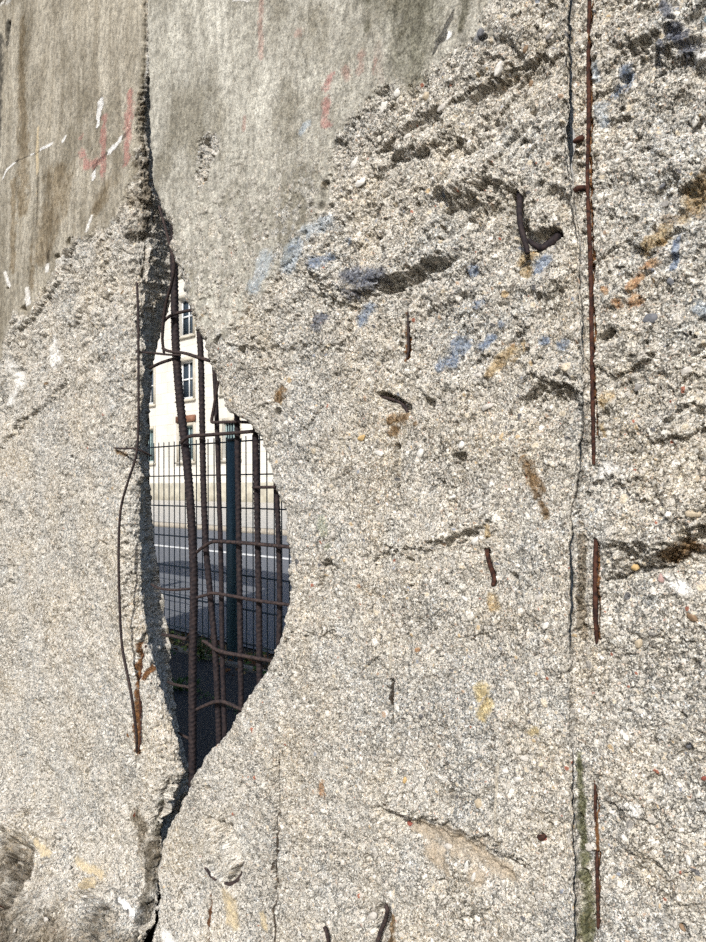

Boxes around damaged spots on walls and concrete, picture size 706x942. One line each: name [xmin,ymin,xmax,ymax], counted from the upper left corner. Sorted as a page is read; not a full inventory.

spalling [136,96,147,128]
corrosion [588,0,658,435]
spalling [0,148,185,942]
corrosion [126,642,156,754]
spalling [152,0,706,942]